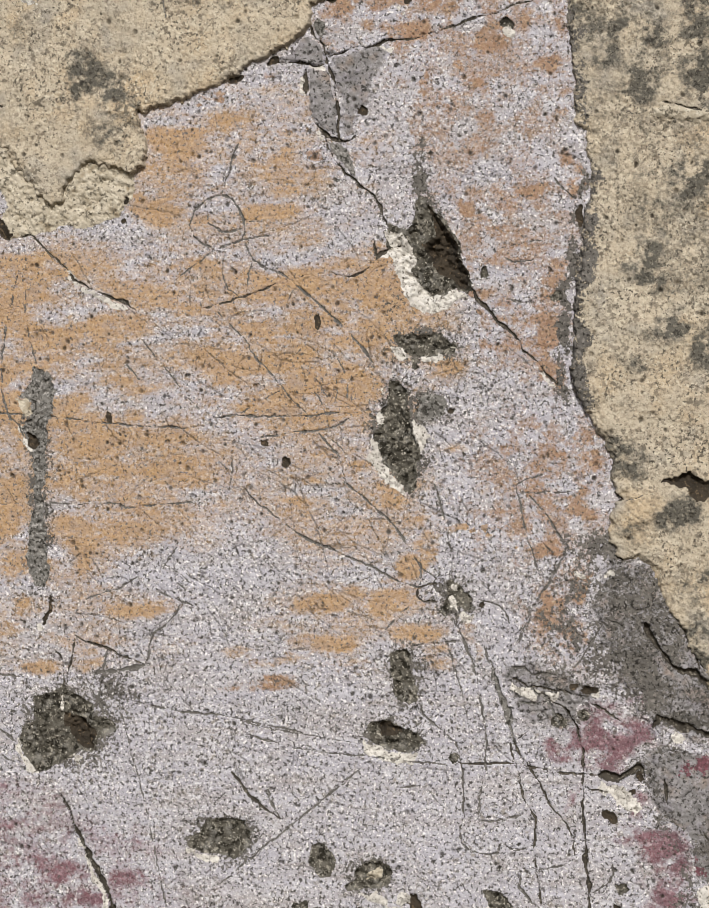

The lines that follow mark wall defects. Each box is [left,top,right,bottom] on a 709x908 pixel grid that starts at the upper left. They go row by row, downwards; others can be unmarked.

peeling [308,42,391,176]
crack [289,0,533,278]
crack [0,234,133,437]
spalling [359,205,476,520]
crack [472,289,558,388]
spalling [1,659,142,784]
crack [58,793,116,908]
crack [55,635,145,686]
spalling [164,771,281,871]
spalling [308,842,422,908]
crack [122,647,645,908]
spalling [347,639,441,765]